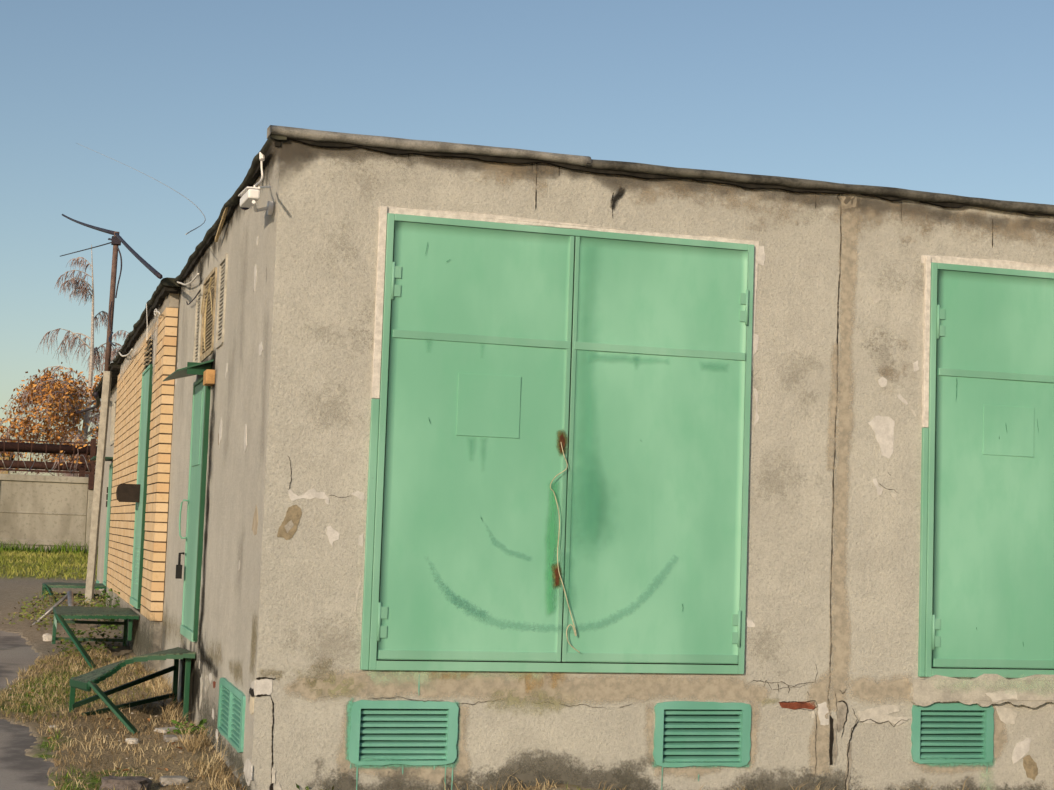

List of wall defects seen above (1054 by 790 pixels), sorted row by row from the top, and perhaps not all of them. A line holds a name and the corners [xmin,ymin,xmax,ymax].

corrosion [557,430,567,455]
flaking render [868,416,895,459]
spalling [277,455,365,540]
crack [753,183,844,778]
water stain [180,375,251,790]
flaking render [909,674,1054,724]
water stain [308,751,658,790]
water stain [727,769,866,790]
flaking render [762,690,909,790]
water stain [944,777,1040,790]
spalling [1012,737,1038,780]